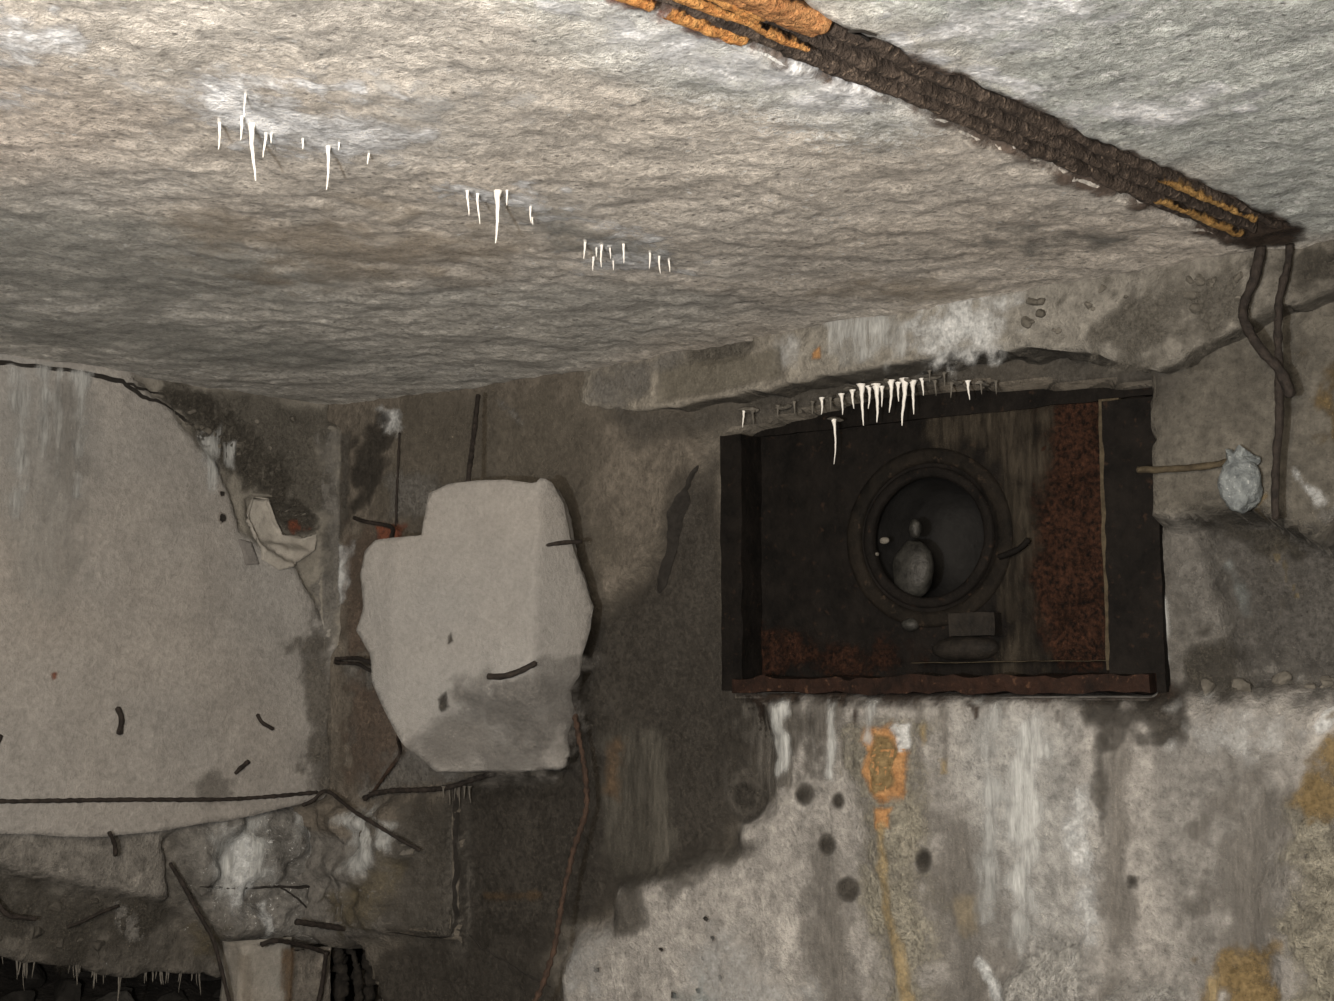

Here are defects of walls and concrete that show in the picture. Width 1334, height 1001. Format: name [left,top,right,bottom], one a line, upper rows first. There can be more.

water stain [178,73,439,190]
water stain [433,181,694,276]
corrosion [616,0,882,99]
corrosion [904,53,1071,129]
corrosion [911,105,1304,249]
crack [0,360,203,432]
spalling [352,432,401,538]
spalling [466,394,481,482]
water stain [622,298,1174,462]
corrosion [739,686,1182,1001]
water stain [1064,688,1189,938]
spalling [169,862,231,1001]